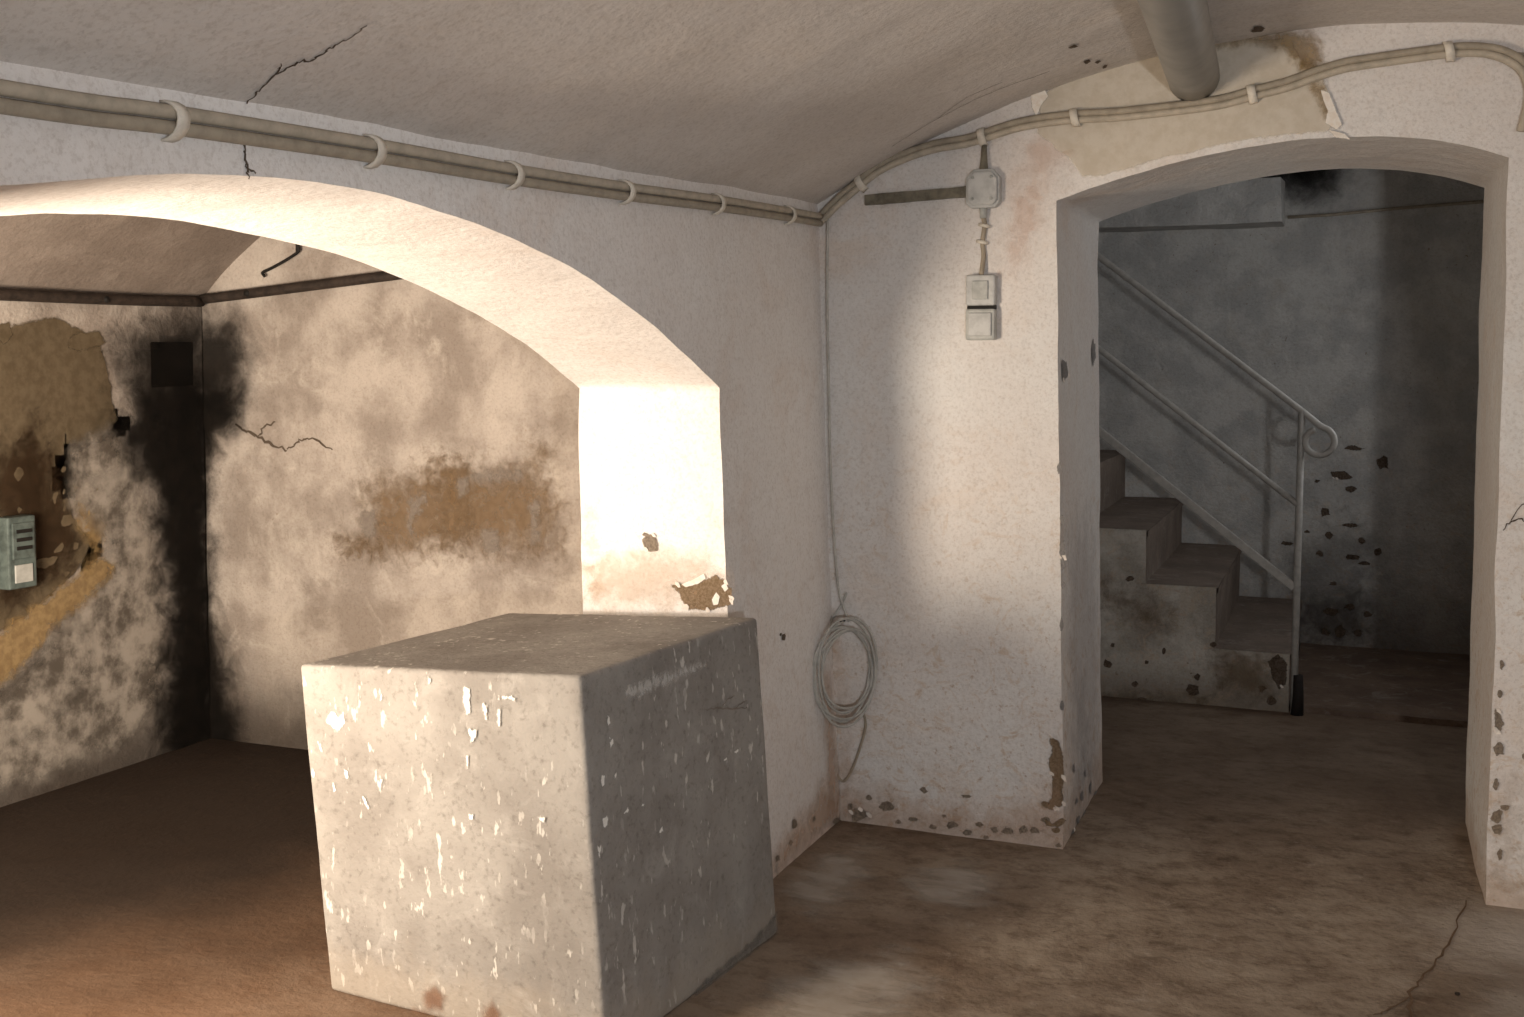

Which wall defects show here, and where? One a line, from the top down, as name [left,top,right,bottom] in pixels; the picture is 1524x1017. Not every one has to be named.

crack [246,25,367,104]
crack [243,145,256,179]
damp [1287,170,1322,178]
crack [235,421,333,452]
flaking render [0,318,117,630]
peeling [1314,471,1357,493]
peeling [1345,445,1388,469]
damp [0,321,247,784]
peeling [1281,508,1382,565]
flaking render [672,573,735,613]
crack [1373,900,1467,1017]